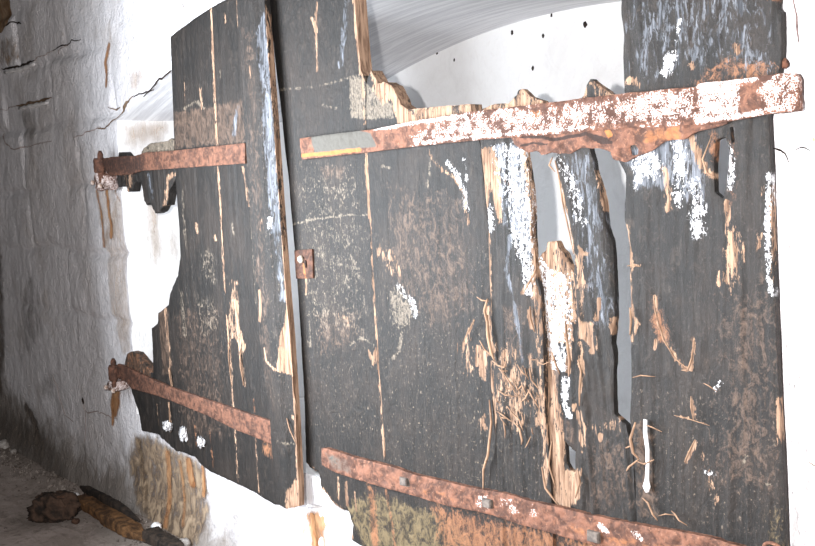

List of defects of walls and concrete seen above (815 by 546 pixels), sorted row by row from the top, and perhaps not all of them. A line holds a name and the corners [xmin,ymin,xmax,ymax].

spalling [0,0,21,33]
crack [1,39,81,74]
crack [1,97,52,111]
crack [73,70,171,138]
corrosion [96,190,113,247]
corrosion [110,391,120,426]
water stain [130,436,208,545]
corrosion [307,511,326,546]